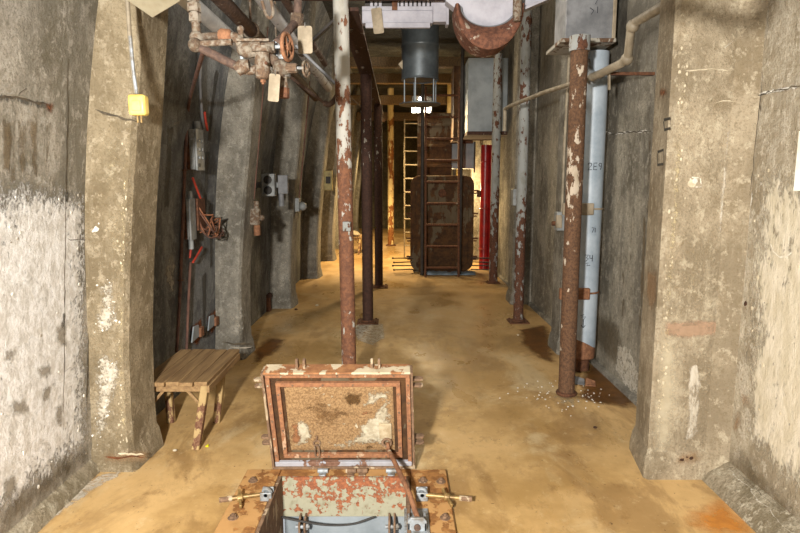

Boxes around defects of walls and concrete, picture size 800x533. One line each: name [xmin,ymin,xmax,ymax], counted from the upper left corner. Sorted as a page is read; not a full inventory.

crack [95,109,137,122]
crack [748,75,800,230]
crack [0,89,85,412]
leakage [522,326,552,361]
leakage [91,356,122,445]
leakage [686,365,701,438]